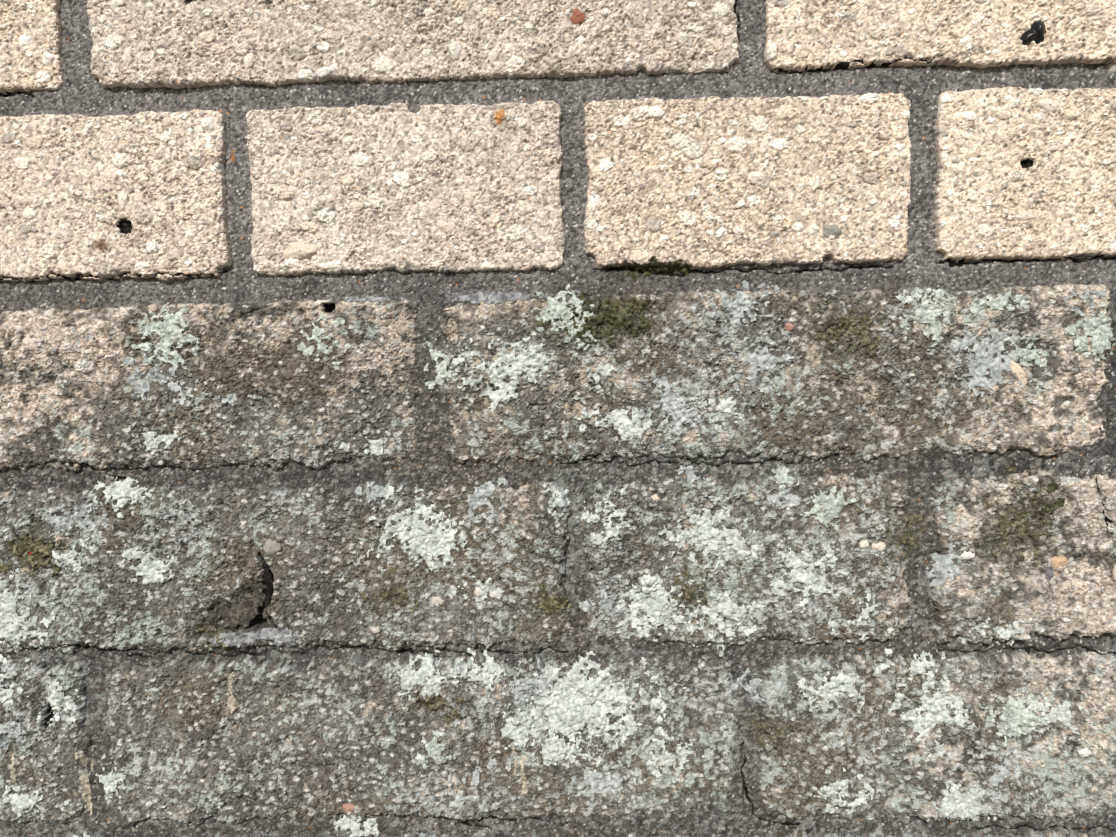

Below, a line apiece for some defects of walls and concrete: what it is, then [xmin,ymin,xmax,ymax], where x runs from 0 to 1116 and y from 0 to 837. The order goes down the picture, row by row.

spalling [191,554,301,648]
damp [224,672,236,715]
damp [10,753,18,786]
damp [74,750,94,814]
damp [510,745,529,796]